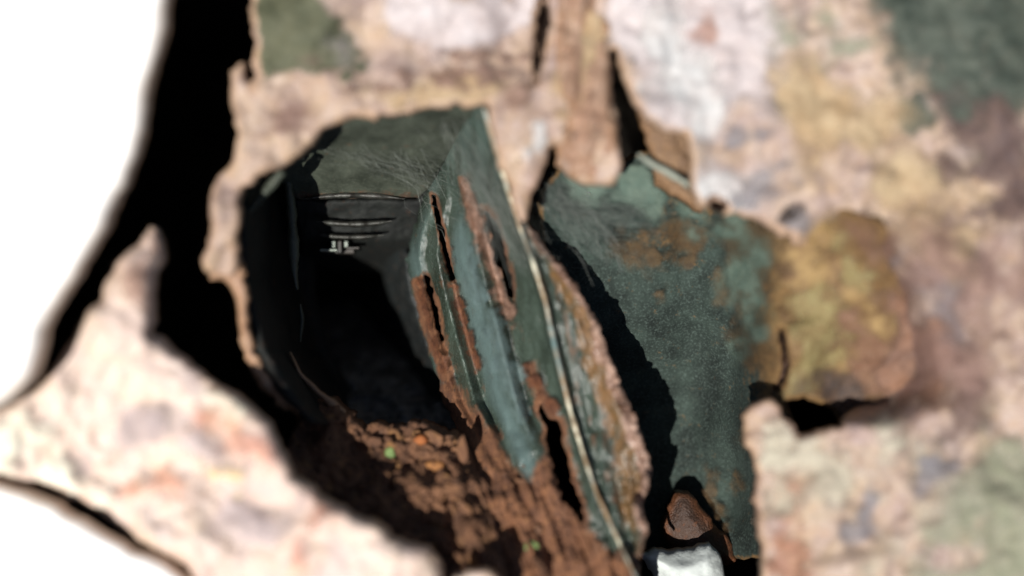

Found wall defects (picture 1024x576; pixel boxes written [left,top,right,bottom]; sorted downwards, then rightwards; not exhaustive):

spalling [708,194,728,213]
corrosion [463,178,515,328]
corrosion [444,270,481,374]
crack [777,298,790,388]
peeling [454,567,497,576]